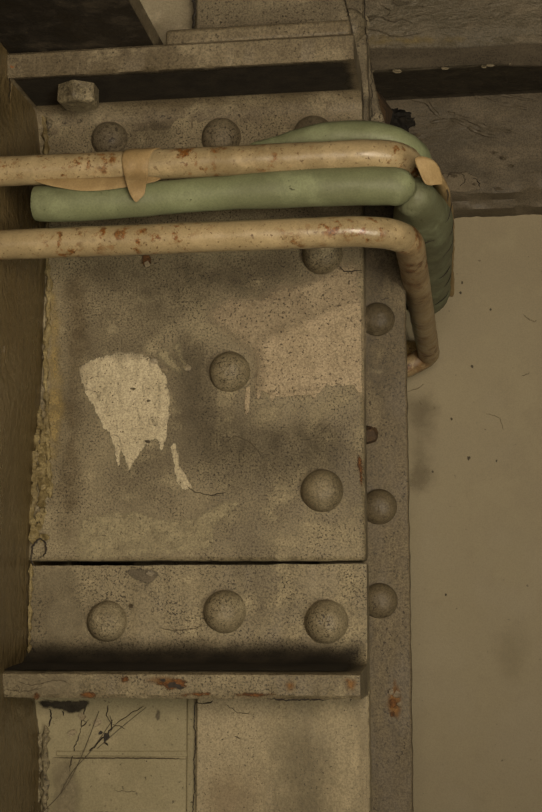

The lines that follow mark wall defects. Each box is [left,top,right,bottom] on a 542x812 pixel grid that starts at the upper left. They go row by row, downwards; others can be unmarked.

flaking render [28,258,54,544]
peeling [79,344,192,490]
flaking render [26,564,34,653]
flaking render [38,725,51,812]
damp [40,700,88,726]
crack [55,700,249,812]
rust [155,678,211,696]